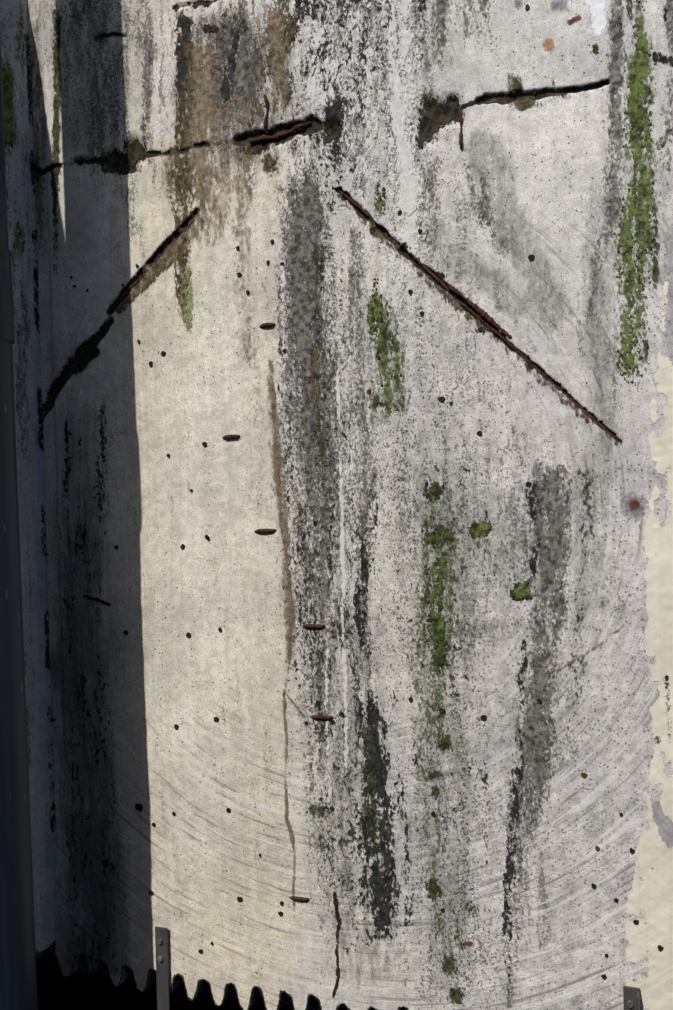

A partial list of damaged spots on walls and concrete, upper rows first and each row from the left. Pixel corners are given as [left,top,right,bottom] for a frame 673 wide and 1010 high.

water stain [15,227,46,459]
water stain [50,0,105,275]
water stain [82,47,128,137]
crack [33,135,234,182]
water stain [139,0,490,942]
water stain [465,164,516,261]
crack [460,74,610,110]
water stain [586,0,627,321]
peeling [659,279,670,334]
water stain [36,395,124,973]
water stain [501,459,595,1002]
peeling [624,350,673,1010]